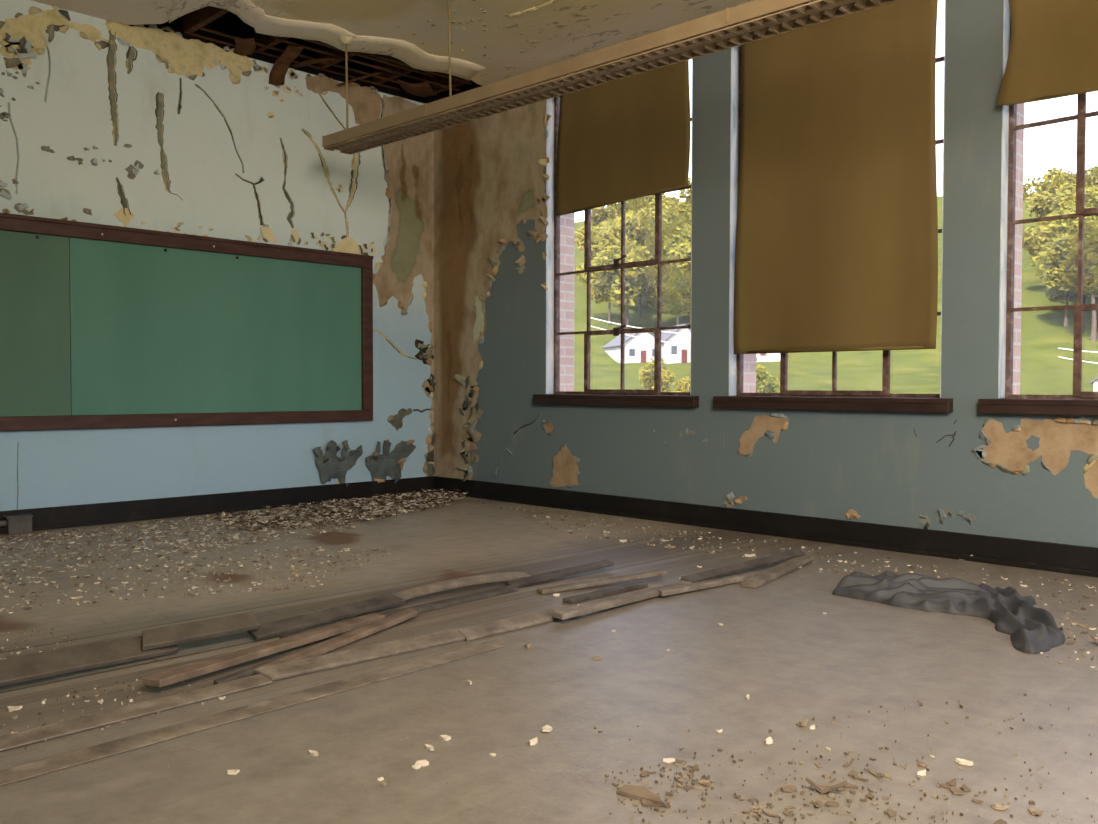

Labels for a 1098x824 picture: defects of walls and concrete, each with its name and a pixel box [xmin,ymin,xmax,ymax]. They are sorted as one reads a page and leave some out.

peeling [0,88,16,121]
crack [43,38,51,102]
crack [106,31,138,146]
flaking render [0,6,268,90]
crack [8,103,20,191]
peeling [67,145,112,166]
peeling [125,160,160,179]
crack [155,78,392,261]
crack [113,177,135,227]
flaking render [245,100,551,487]
flaking render [549,444,580,489]
flaking render [737,413,789,457]